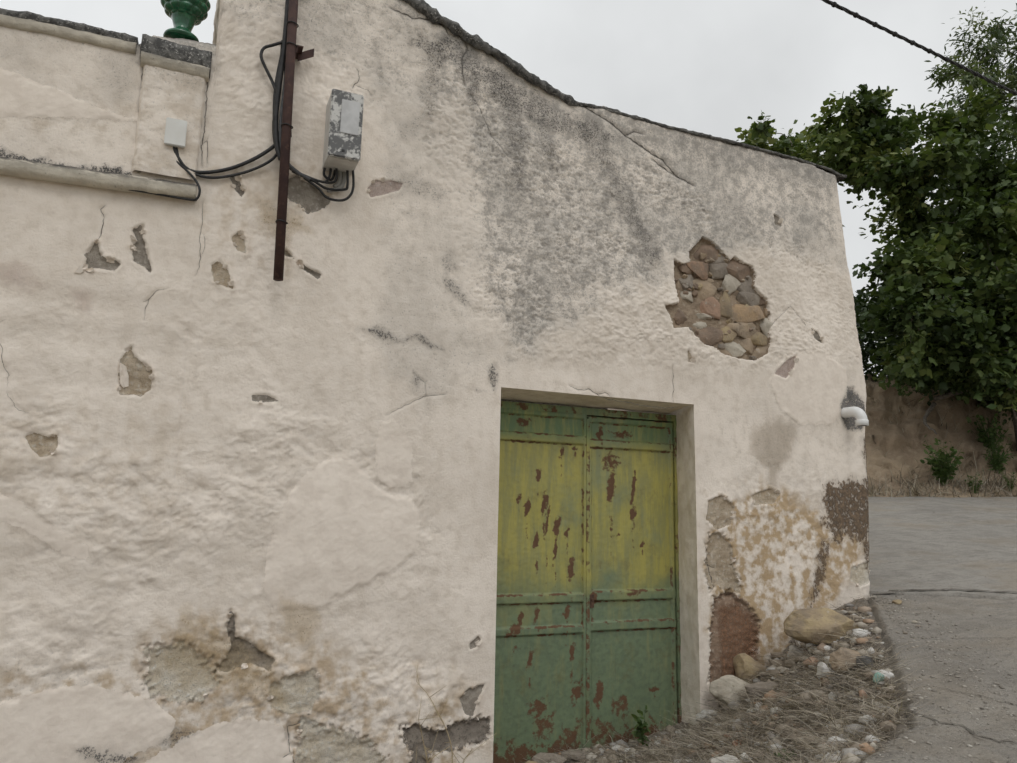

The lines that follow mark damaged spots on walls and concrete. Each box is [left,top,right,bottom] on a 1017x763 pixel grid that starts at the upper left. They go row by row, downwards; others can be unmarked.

crack [583,106,692,185]
peeling [367,177,403,197]
spalling [74,239,120,274]
spalling [130,225,151,272]
spalling [211,261,234,289]
spalling [665,238,774,360]
spalling [117,346,155,397]
spalling [25,433,58,457]
spalling [751,489,780,505]
spalling [704,495,762,683]
spalling [142,611,321,714]
spalling [399,685,490,763]